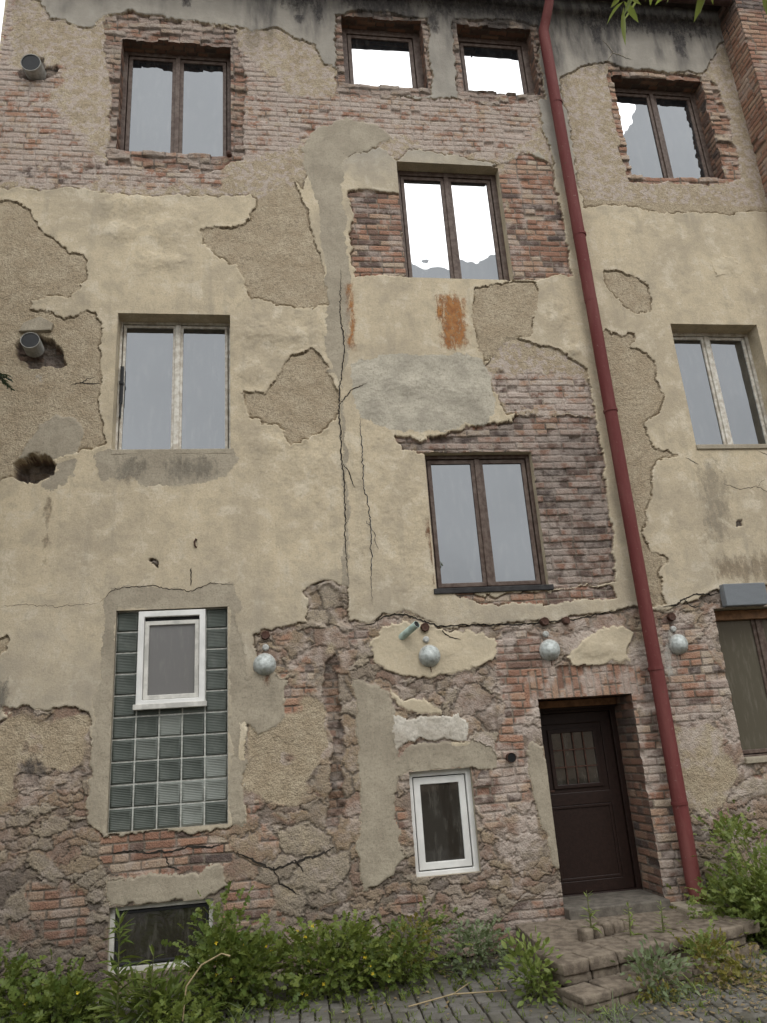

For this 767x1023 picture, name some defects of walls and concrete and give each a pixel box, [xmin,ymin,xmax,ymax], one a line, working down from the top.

leakage [428,0,542,33]
leakage [579,3,710,56]
spalling [557,41,767,219]
spalling [0,0,621,607]
corrosion [436,295,467,349]
spalling [600,265,652,314]
crack [338,269,633,639]
spalling [602,325,767,897]
crack [111,843,336,894]
spalling [0,580,690,1006]